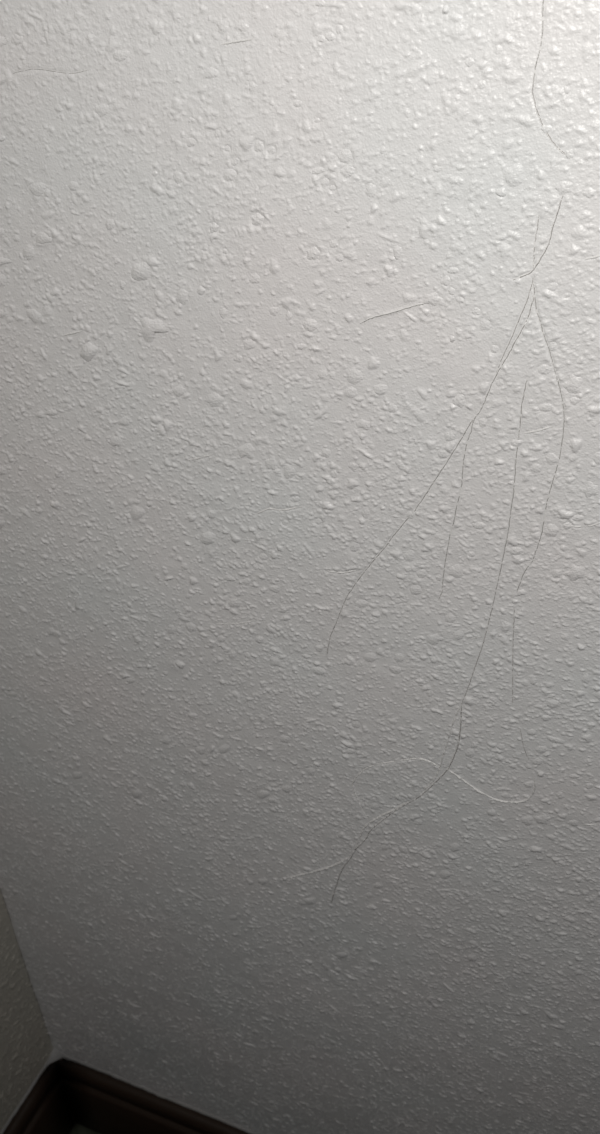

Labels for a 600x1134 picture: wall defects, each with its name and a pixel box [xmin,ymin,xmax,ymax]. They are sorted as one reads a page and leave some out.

crack [531,0,571,160]
crack [286,195,565,902]